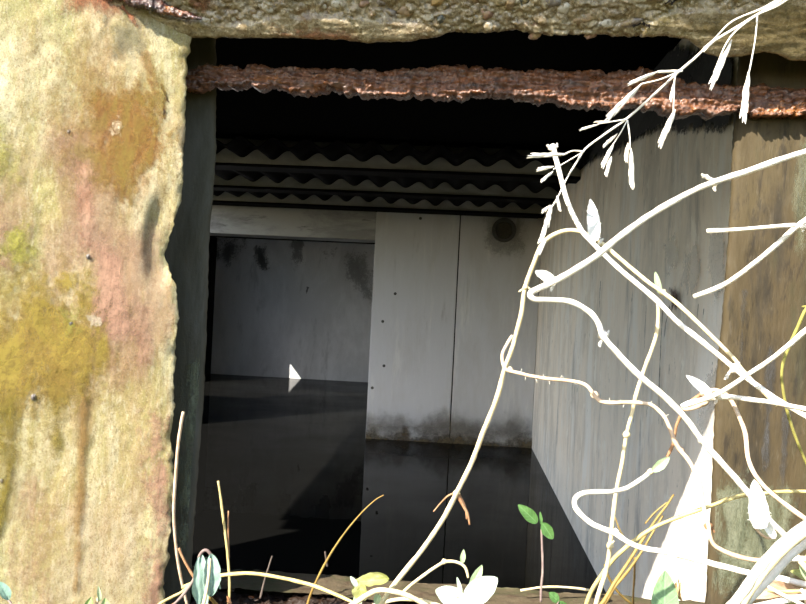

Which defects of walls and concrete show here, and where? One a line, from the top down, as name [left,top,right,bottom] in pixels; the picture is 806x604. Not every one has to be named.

corrosion [66,0,209,27]
spalling [469,0,493,32]
spalling [546,0,644,39]
leakage [51,427,62,449]
leakage [75,398,87,534]